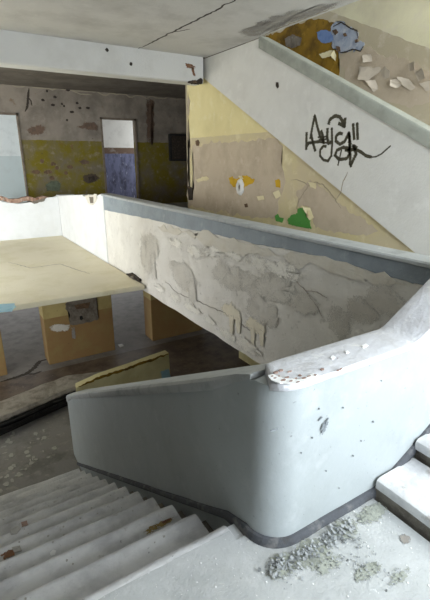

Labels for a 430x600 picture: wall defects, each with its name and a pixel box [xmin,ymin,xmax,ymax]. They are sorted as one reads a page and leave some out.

crack [138,0,236,49]
peeling [265,19,430,108]
rust [146,99,155,144]
spalling [0,159,61,204]
peeling [187,95,311,229]
flaking render [158,224,408,288]
flaking render [65,297,99,325]
crack [169,284,267,338]
spalling [268,368,324,385]